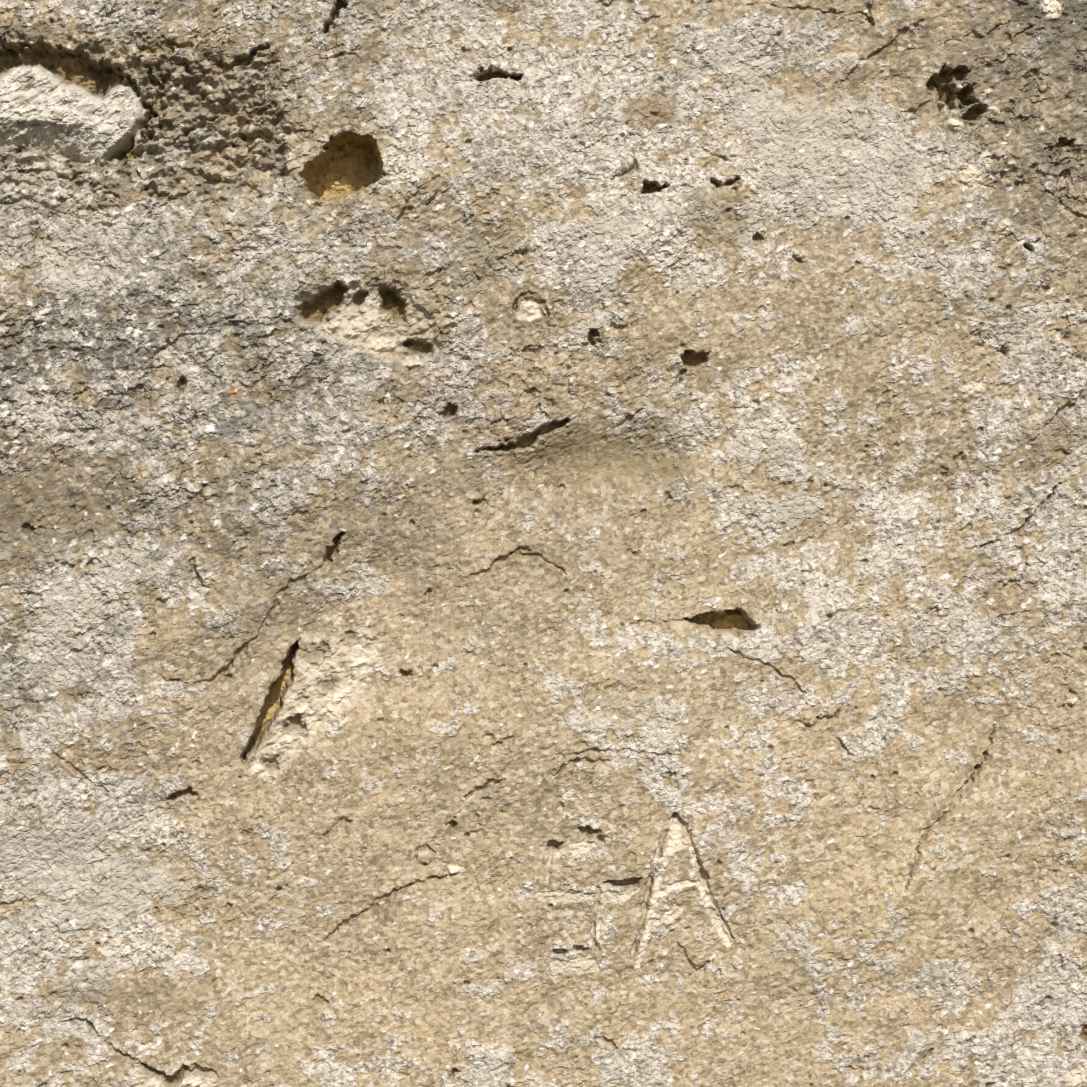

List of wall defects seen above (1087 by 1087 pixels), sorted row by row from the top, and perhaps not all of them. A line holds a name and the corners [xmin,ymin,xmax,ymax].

spalling [0,7,311,227]
crack [187,555,211,590]
crack [157,564,325,689]
crack [457,544,568,580]
crack [905,724,996,892]
crack [317,872,458,944]